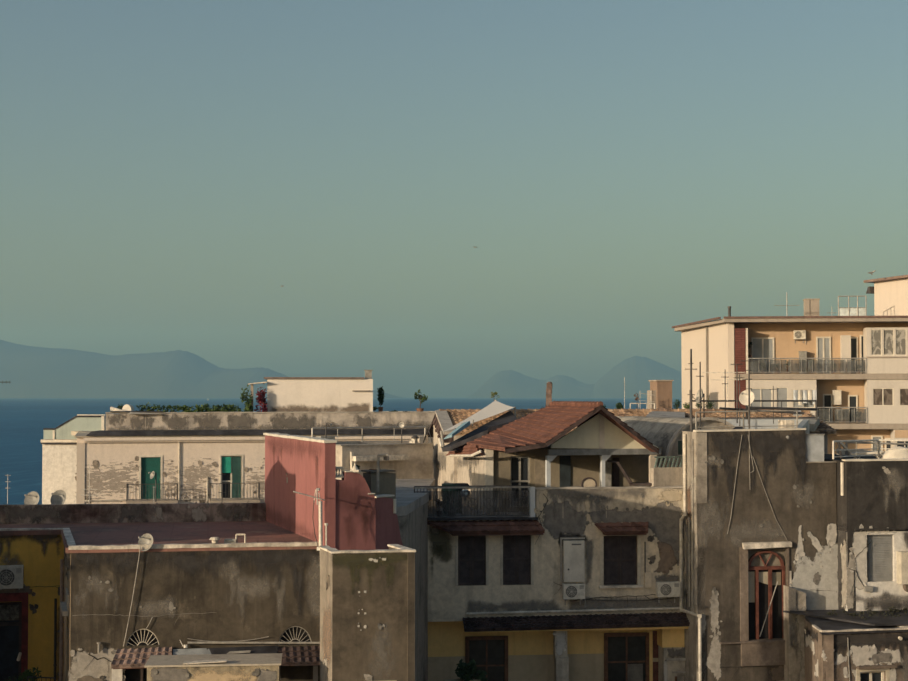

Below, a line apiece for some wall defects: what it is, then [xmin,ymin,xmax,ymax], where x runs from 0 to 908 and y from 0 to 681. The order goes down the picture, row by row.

leakage [109,404,430,430]
peeling [75,456,142,502]
peeling [163,458,219,503]
leakage [885,470,902,505]
spalling [534,476,696,577]
peeling [790,524,904,681]
peeling [697,587,722,681]
peeling [68,648,126,681]